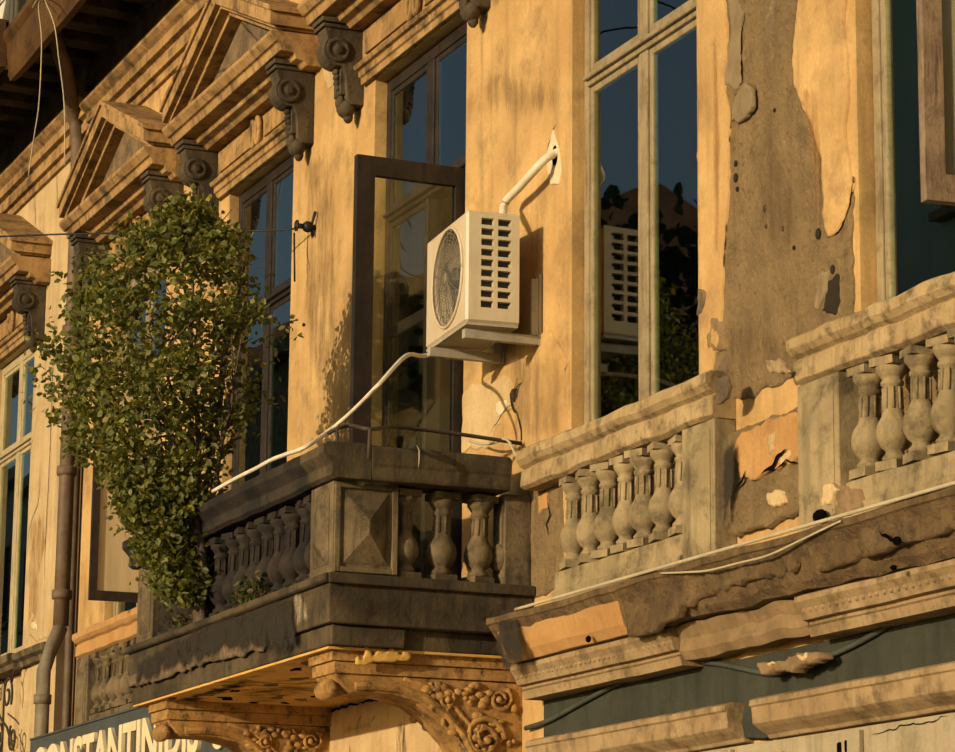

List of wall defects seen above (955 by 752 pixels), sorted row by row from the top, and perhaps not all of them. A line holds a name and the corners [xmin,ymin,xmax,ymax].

peeling [696,0,856,404]
peeling [461,375,513,453]
crack [494,377,524,449]
flaking render [728,406,799,537]
spalling [125,641,264,687]
peeling [205,661,318,704]
peeling [355,647,411,666]